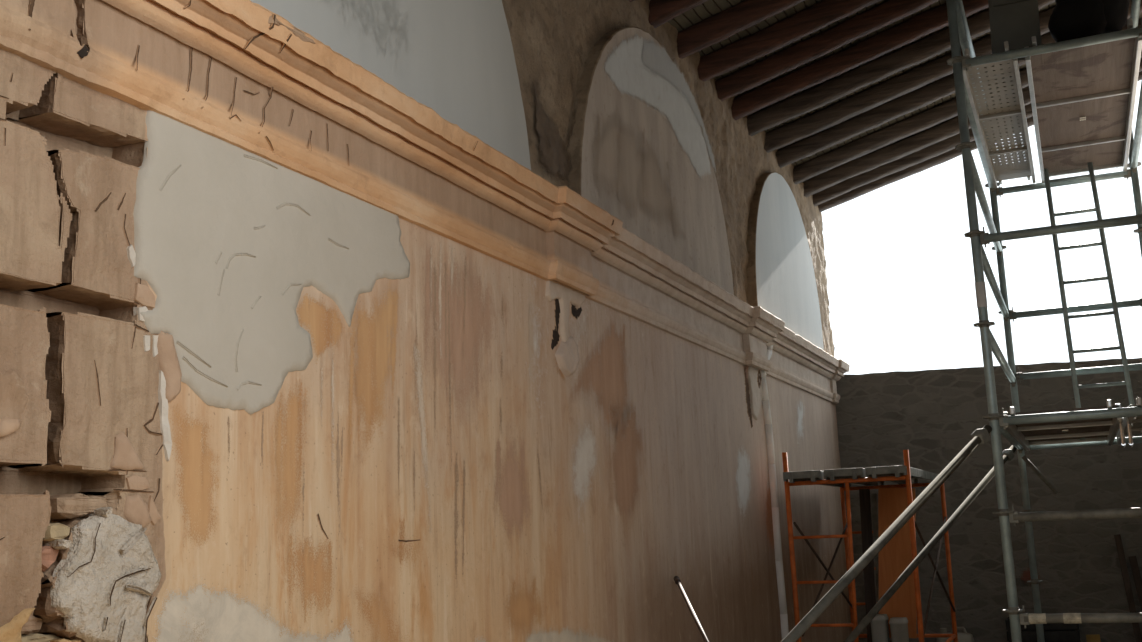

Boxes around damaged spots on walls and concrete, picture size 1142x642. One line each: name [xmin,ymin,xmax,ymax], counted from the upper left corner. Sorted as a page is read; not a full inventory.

crack [0,0,130,283]
crack [183,47,349,166]
crack [244,14,292,53]
crack [42,307,66,467]
crack [93,360,101,406]
flaking render [132,282,182,461]
water stain [397,241,467,587]
spalling [0,432,162,642]